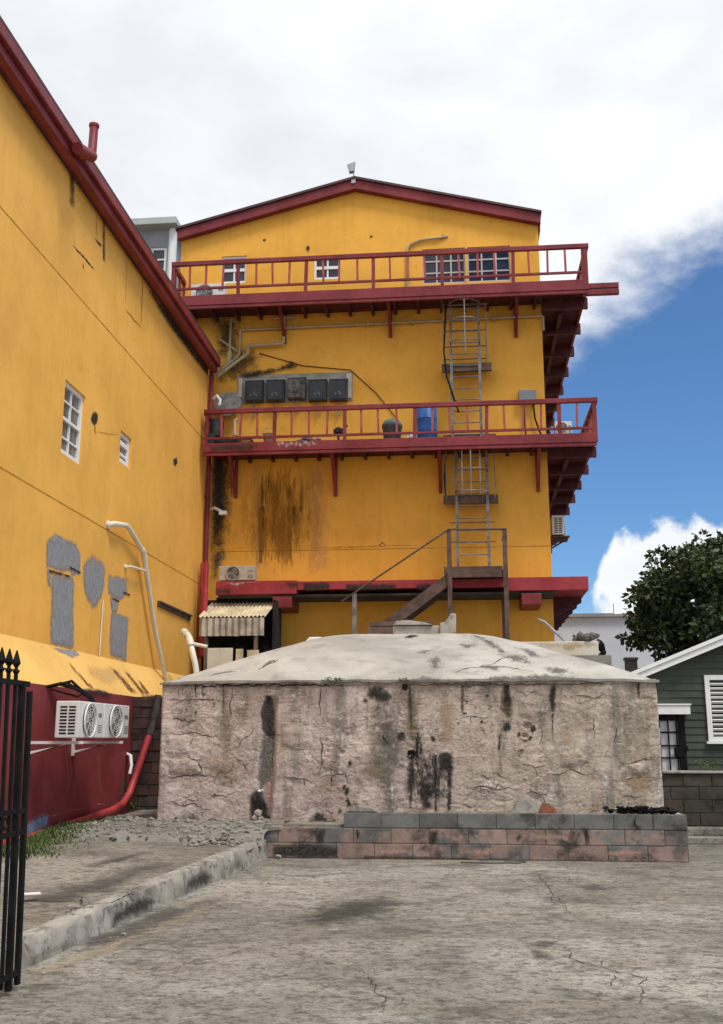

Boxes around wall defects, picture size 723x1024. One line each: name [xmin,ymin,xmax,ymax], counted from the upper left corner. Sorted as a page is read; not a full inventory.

leakage [219,321,236,355]
leakage [212,458,232,576]
peeling [47,535,130,662]
leakage [250,696,275,819]
crack [160,657,655,832]
leakage [404,650,464,811]
leakage [463,636,574,749]
crack [558,946,647,1006]